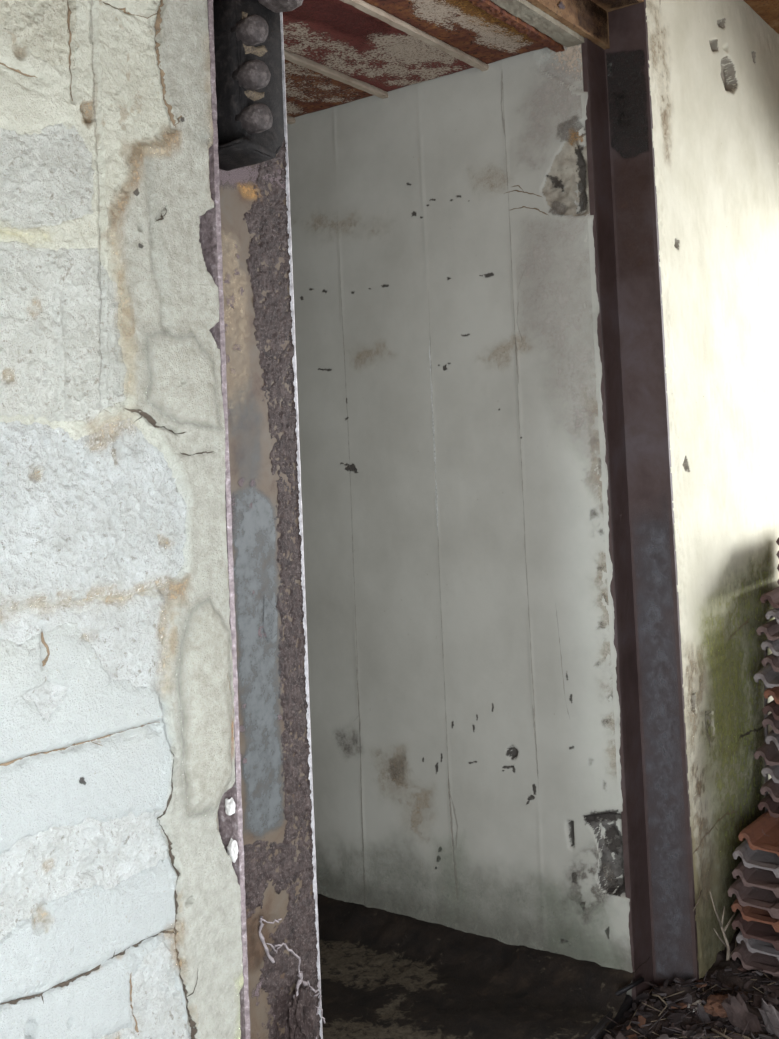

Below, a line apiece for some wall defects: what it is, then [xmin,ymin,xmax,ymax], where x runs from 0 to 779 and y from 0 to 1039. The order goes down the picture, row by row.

rust [283,0,388,39]
rust [445,0,531,42]
rust [558,0,638,38]
crack [99,0,183,127]
spalling [709,18,738,94]
rust [219,161,286,198]
spalling [542,116,590,217]
crack [0,750,198,1039]
water stain [316,858,350,902]
spalling [584,810,625,897]
rust [246,916,269,969]